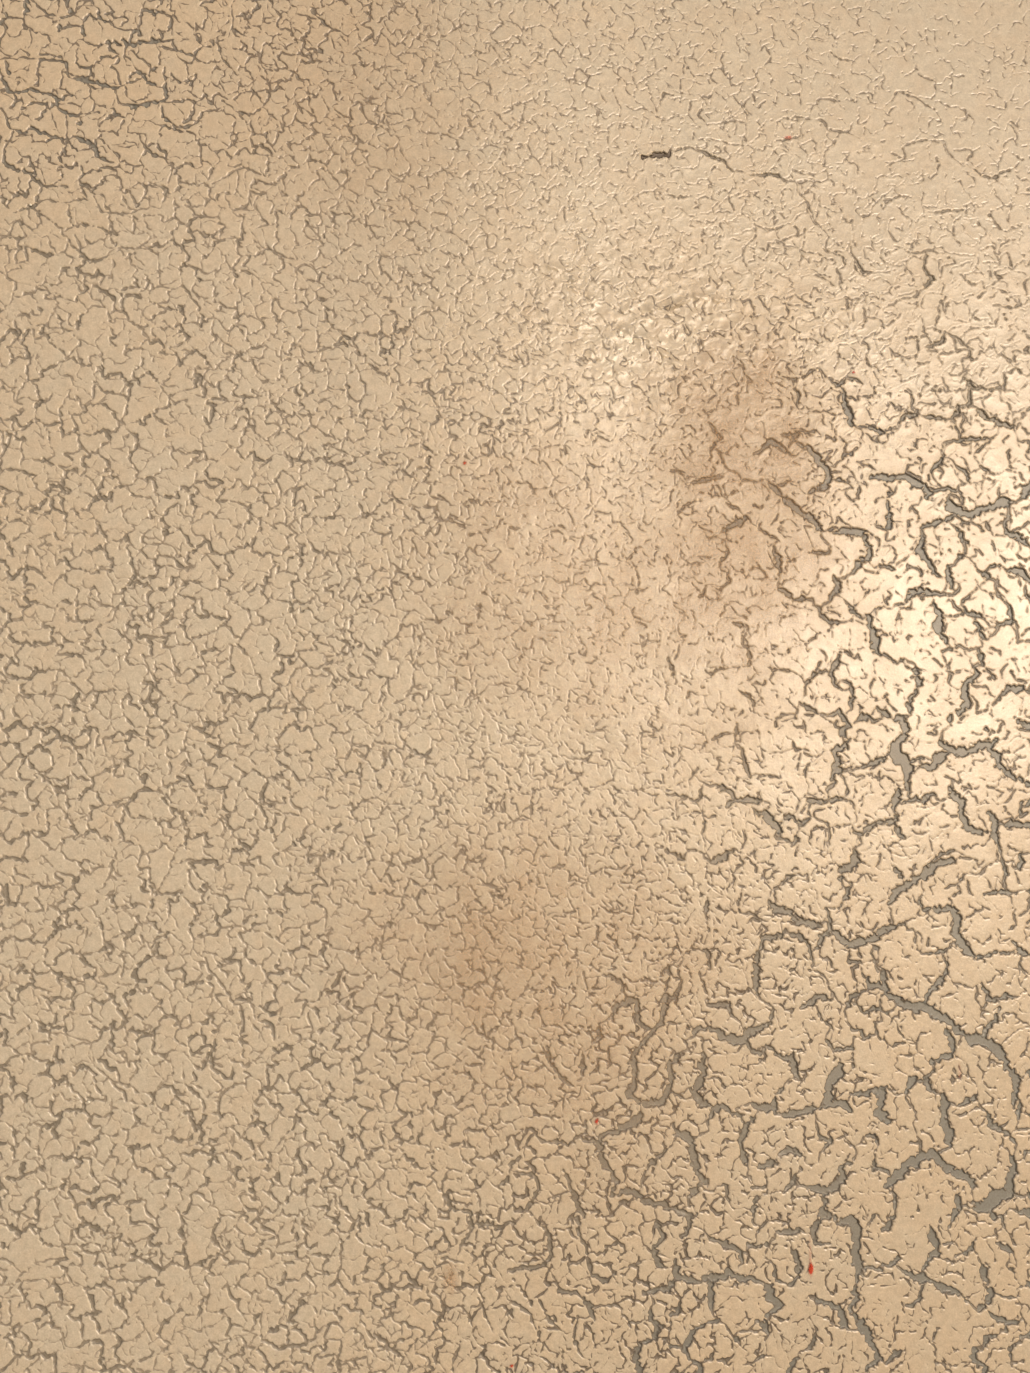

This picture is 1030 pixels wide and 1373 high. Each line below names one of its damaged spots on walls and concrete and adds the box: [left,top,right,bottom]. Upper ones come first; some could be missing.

crack [948,0,1030,184]
crack [826,375,865,389]
crack [839,386,858,428]
crack [853,397,920,437]
crack [776,586,816,605]
crack [964,555,1004,582]
crack [1001,564,1030,614]
crack [930,574,1030,666]
crack [728,620,757,668]
crack [701,848,736,867]
crack [836,835,864,890]
crack [798,992,835,1011]